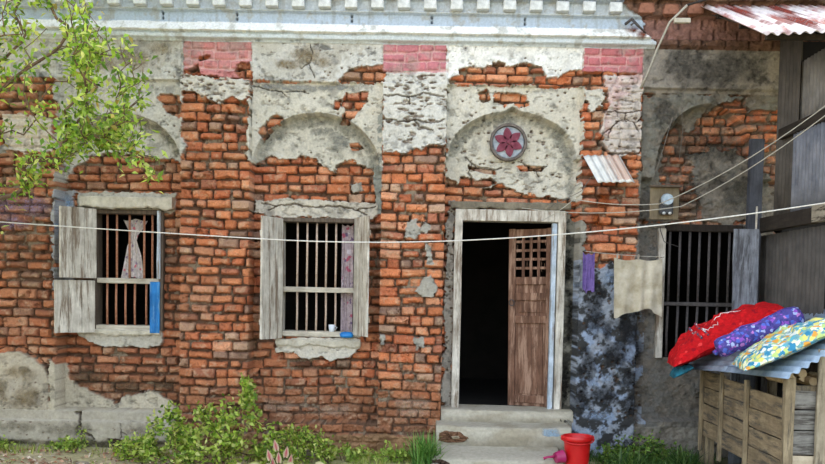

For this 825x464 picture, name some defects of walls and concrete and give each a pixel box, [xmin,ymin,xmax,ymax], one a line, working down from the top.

corrosion [770,6,821,27]
spalling [658,95,778,225]
spalling [0,54,648,451]
leakage [565,250,578,345]
leakage [562,347,616,410]
leakage [587,283,641,413]